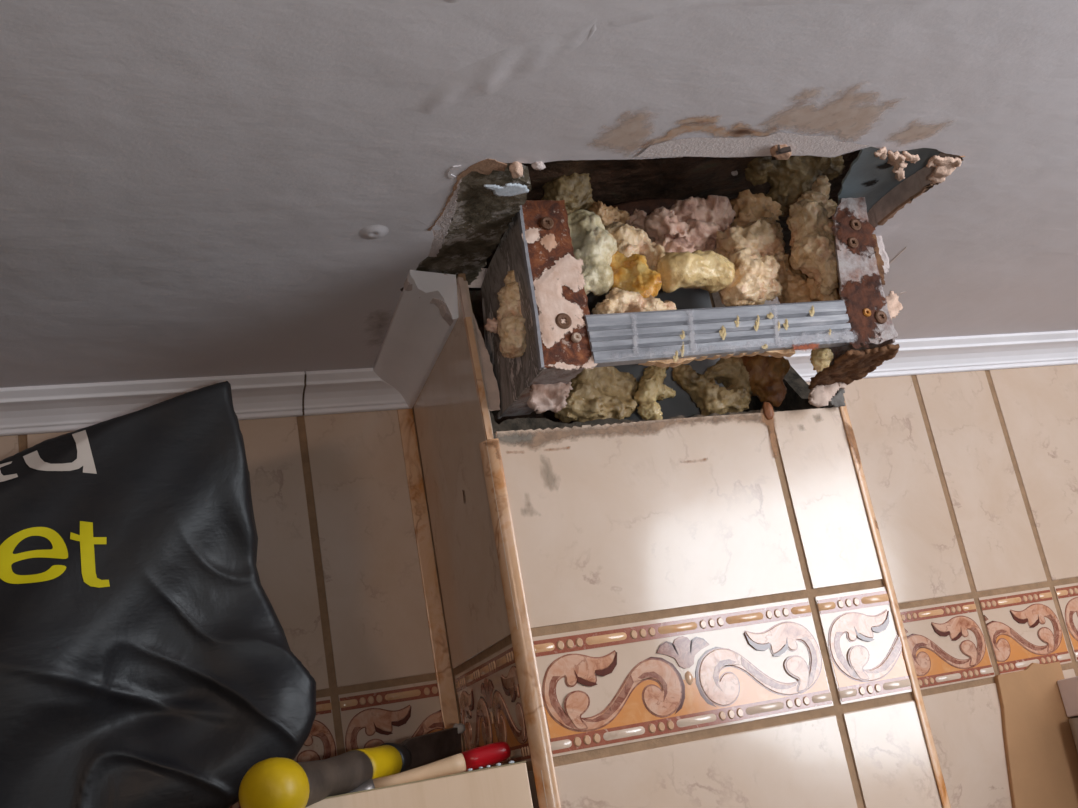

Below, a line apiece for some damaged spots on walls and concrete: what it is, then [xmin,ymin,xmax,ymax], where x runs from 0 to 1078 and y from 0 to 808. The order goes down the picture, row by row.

water stain [593,85,895,153]
water stain [891,121,945,144]
flaking render [636,132,965,225]
peeling [404,159,532,326]
rust [831,207,877,258]
rust [840,273,887,349]